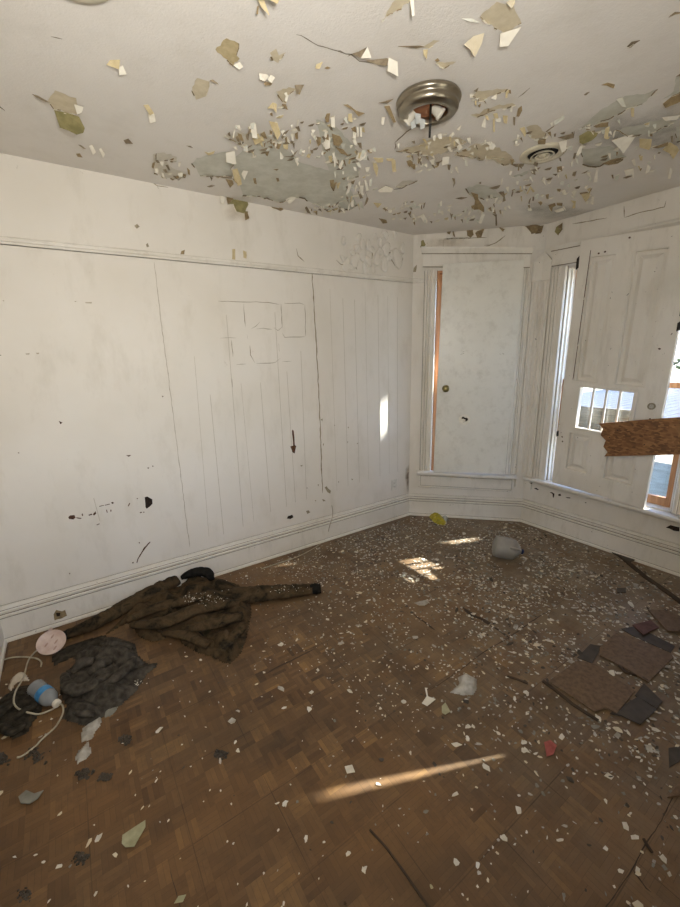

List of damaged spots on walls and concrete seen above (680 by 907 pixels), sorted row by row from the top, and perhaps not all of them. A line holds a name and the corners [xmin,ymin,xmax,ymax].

peeling [215,38,243,70]
crack [296,34,374,64]
peeling [353,47,398,76]
peeling [398,40,455,69]
peeling [33,91,105,158]
peeling [152,73,680,238]
crack [296,249,323,493]